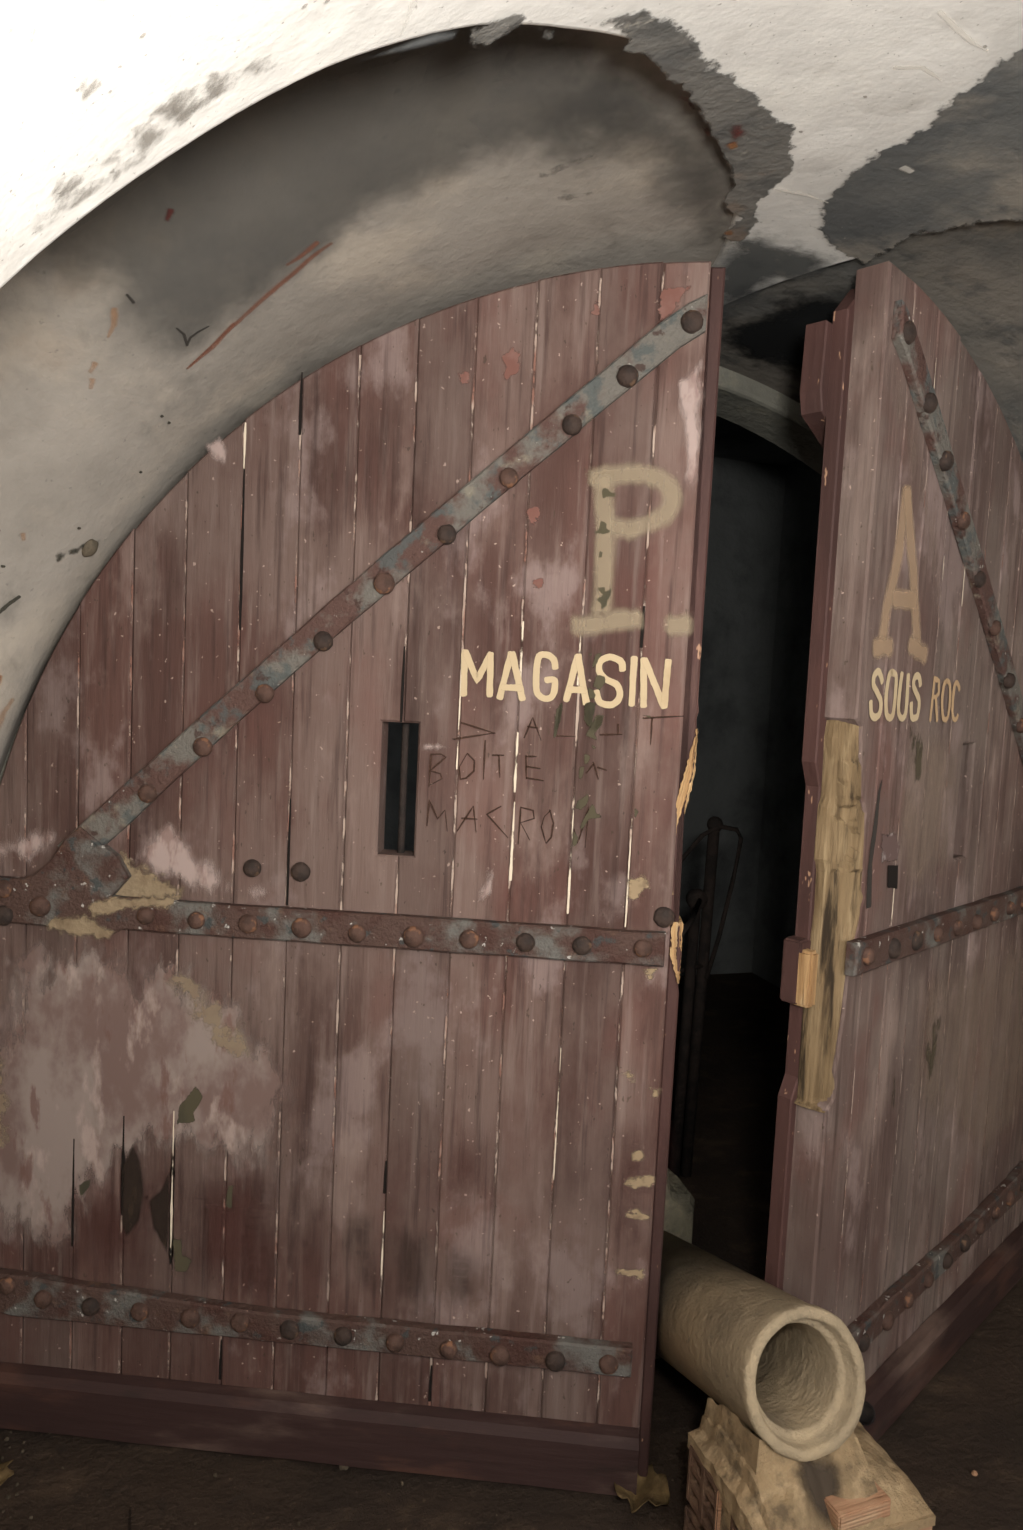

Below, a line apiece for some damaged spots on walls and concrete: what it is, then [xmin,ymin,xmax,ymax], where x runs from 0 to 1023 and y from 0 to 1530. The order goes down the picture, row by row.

damp [51,25,710,338]
flaking render [471,14,526,45]
flaking render [607,9,803,241]
flaking render [818,49,1023,264]